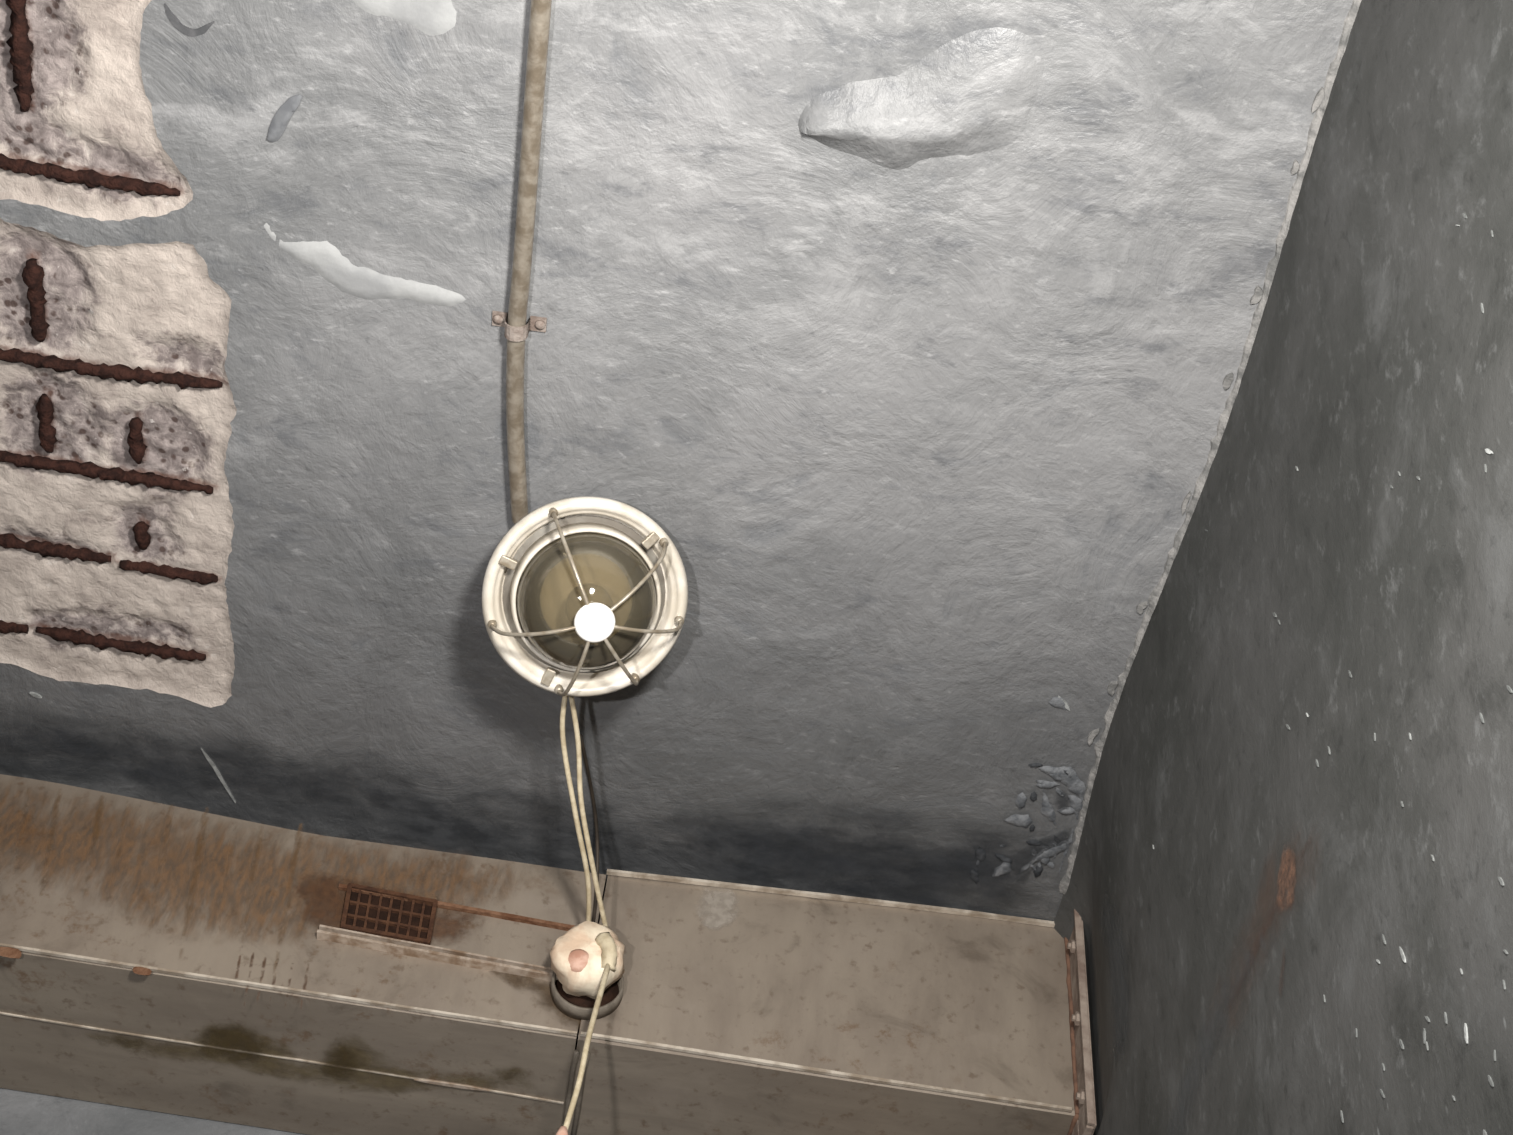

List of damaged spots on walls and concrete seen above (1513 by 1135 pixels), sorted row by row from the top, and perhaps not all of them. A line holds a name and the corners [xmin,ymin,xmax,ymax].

peeling [353,0,457,36]
spalling [0,0,193,221]
peeling [264,223,466,306]
spalling [0,218,237,708]
rust [299,878,345,928]
water stain [165,1029,283,1071]
water stain [300,1047,410,1091]